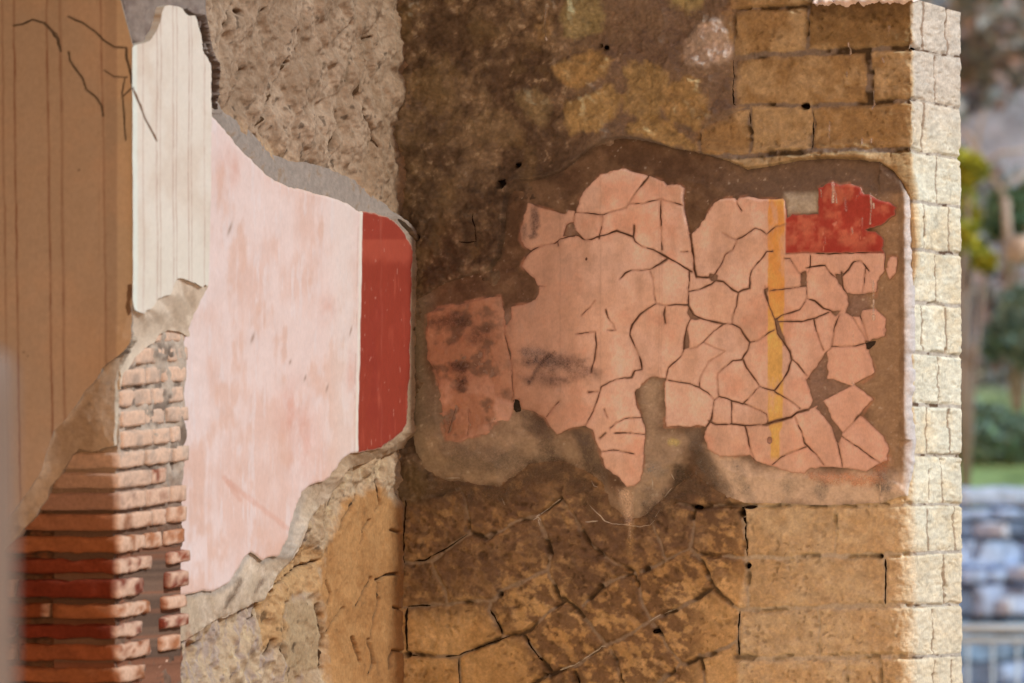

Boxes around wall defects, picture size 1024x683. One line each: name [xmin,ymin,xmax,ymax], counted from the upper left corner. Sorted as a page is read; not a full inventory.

crack [14,17,157,141]
flaking render [684,187,713,230]
flaking render [786,195,817,215]
flaking render [506,269,536,309]
crack [565,212,869,465]
flaking render [635,379,664,427]
flaking render [807,352,849,404]
water stain [619,439,713,526]
crack [742,505,758,556]
crack [355,500,468,656]
crack [446,610,543,683]
crack [735,613,743,655]